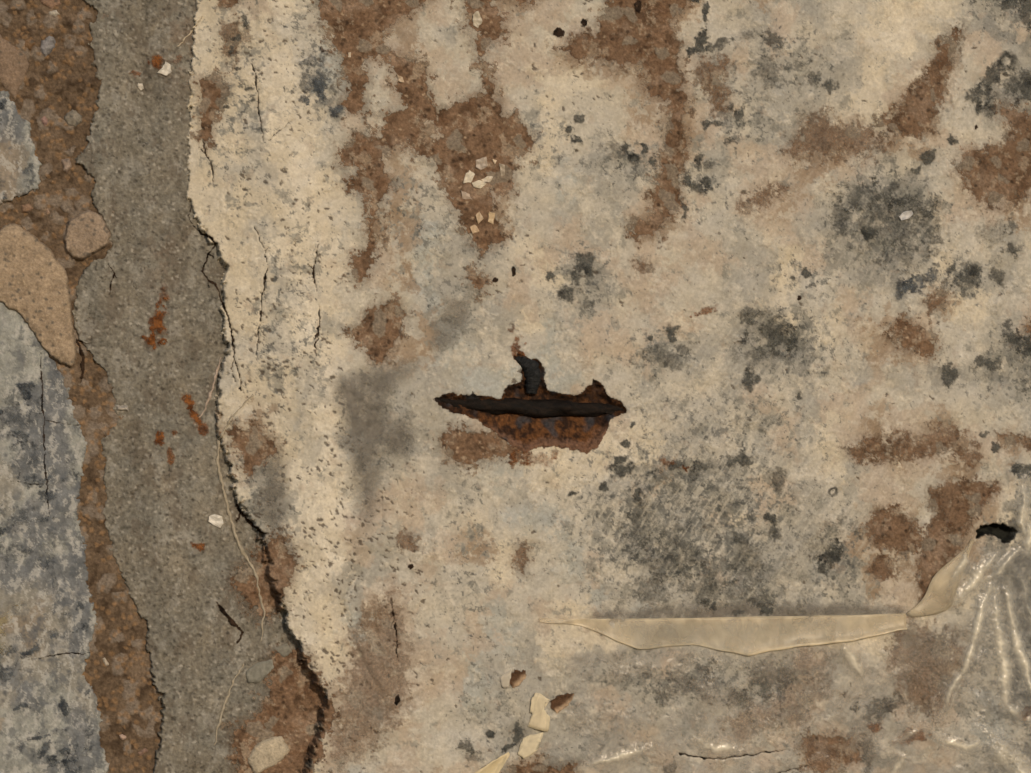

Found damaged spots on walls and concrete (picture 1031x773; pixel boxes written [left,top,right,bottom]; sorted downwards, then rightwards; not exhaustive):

peeling [157,62,172,76]
flaking render [190,0,251,150]
corrosion [142,297,167,349]
corrosion [154,431,177,464]
corrosion [182,395,208,436]
flaking render [219,416,287,482]
spalling [433,353,627,474]
flaking render [841,421,1002,613]
flaking render [222,527,305,628]
flaking render [221,611,408,773]
spalling [510,670,526,688]
spalling [551,693,574,713]